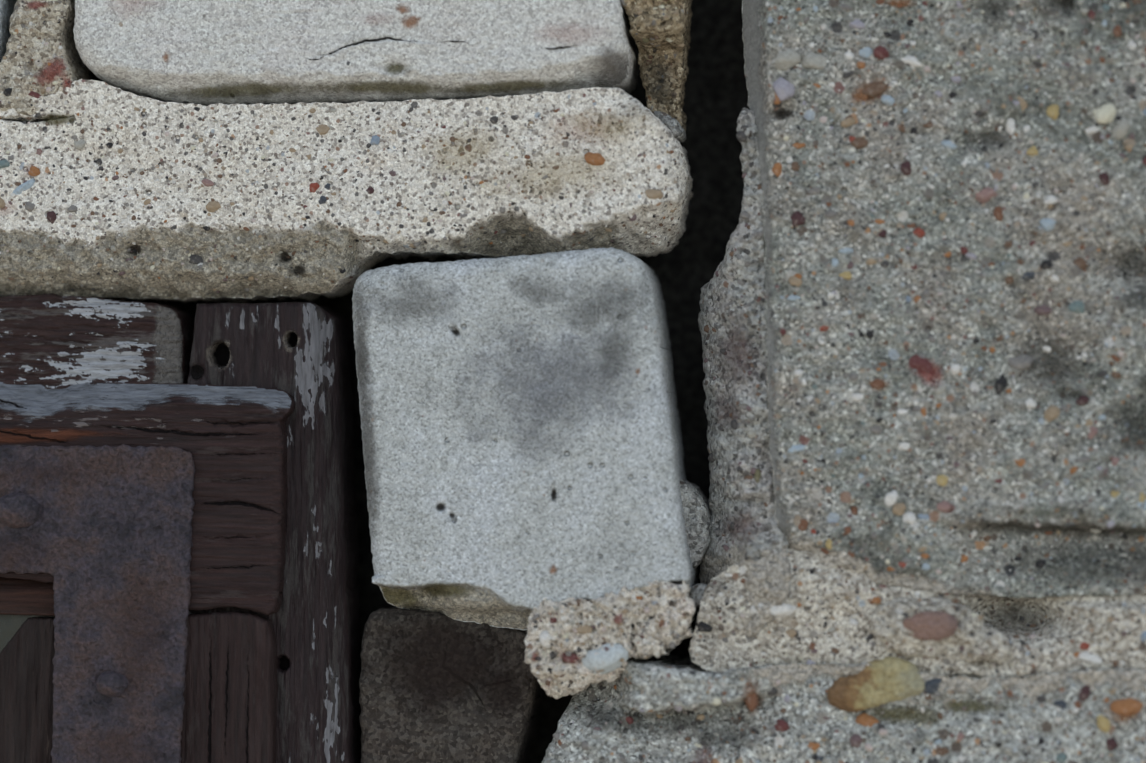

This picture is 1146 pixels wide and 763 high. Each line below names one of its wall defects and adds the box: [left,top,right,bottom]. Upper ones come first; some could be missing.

crack [308,37,417,60]
peeling [1,298,164,388]
peeling [225,305,258,330]
peeling [287,303,335,447]
peeling [304,505,332,576]
peeling [310,665,344,763]